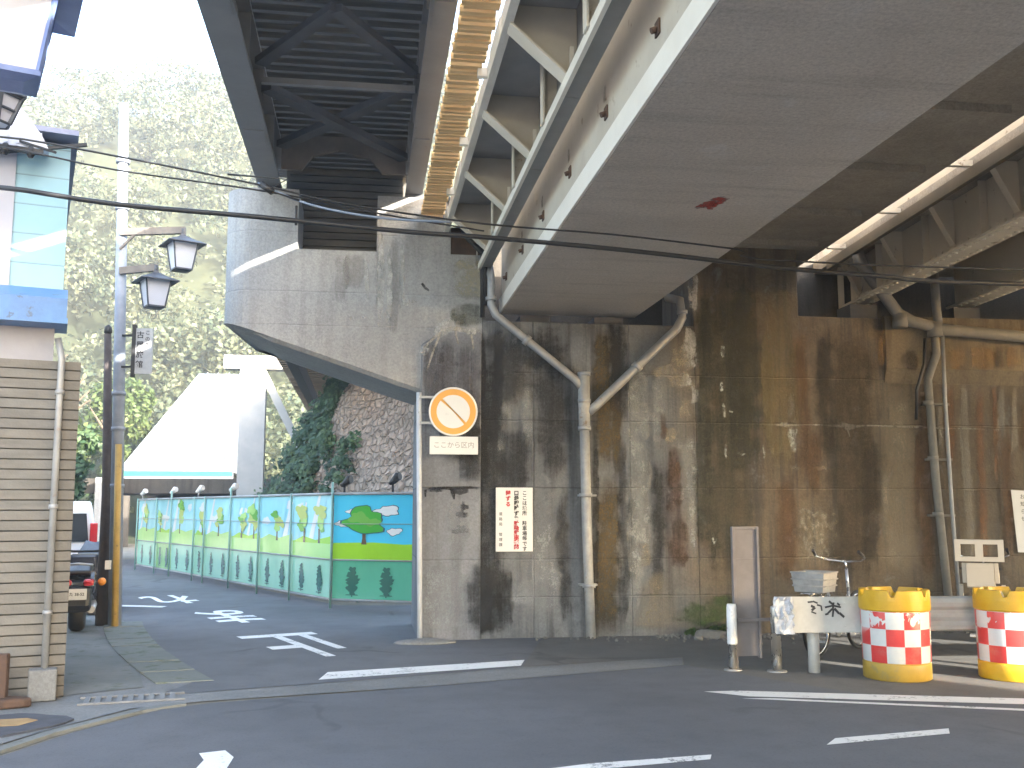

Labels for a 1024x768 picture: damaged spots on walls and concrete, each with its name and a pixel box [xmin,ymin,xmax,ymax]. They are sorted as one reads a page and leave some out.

water stain [424,330,572,633]
rust [667,450,688,566]
water stain [696,287,762,567]